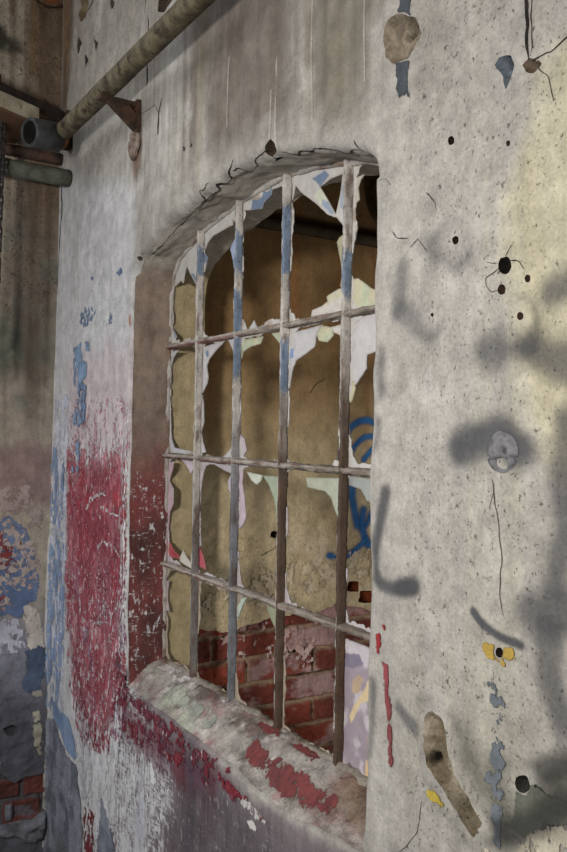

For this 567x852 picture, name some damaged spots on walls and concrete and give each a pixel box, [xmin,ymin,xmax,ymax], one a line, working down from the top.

spalling [158,0,172,12]
spalling [383,13,422,64]
crack [148,140,373,260]
peeling [0,341,266,852]
spalling [244,567,276,609]
spalling [286,553,337,601]
spalling [346,548,372,628]
flaking render [346,633,370,647]
flaking render [157,603,340,814]
spalling [422,682,508,852]
spalling [515,775,530,793]
peeling [516,825,567,852]